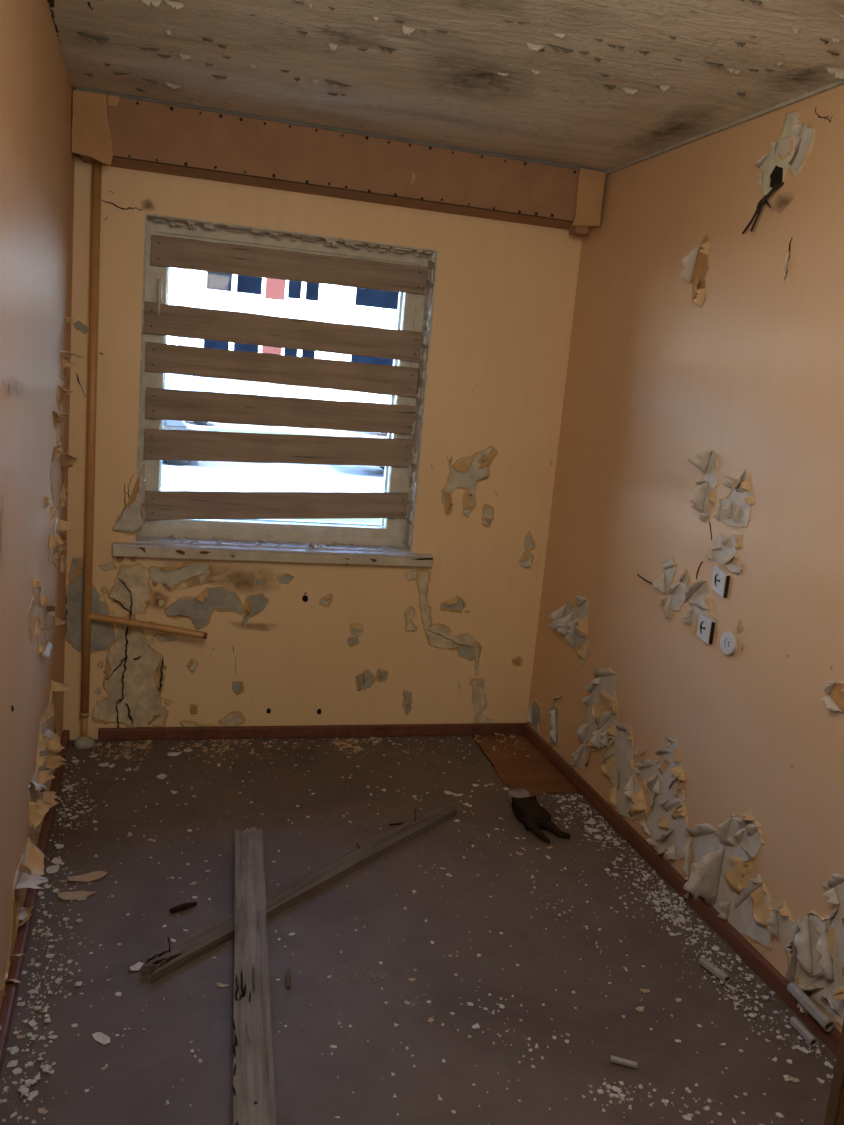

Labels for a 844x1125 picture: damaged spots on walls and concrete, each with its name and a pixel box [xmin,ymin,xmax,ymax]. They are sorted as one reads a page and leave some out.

peeling [680,234,713,308]
spalling [754,110,817,196]
spalling [29,350,295,728]
peeling [150,216,498,723]
peeling [652,450,755,636]
peeling [0,680,70,1010]
peeling [525,696,561,748]
peeling [548,596,844,1026]